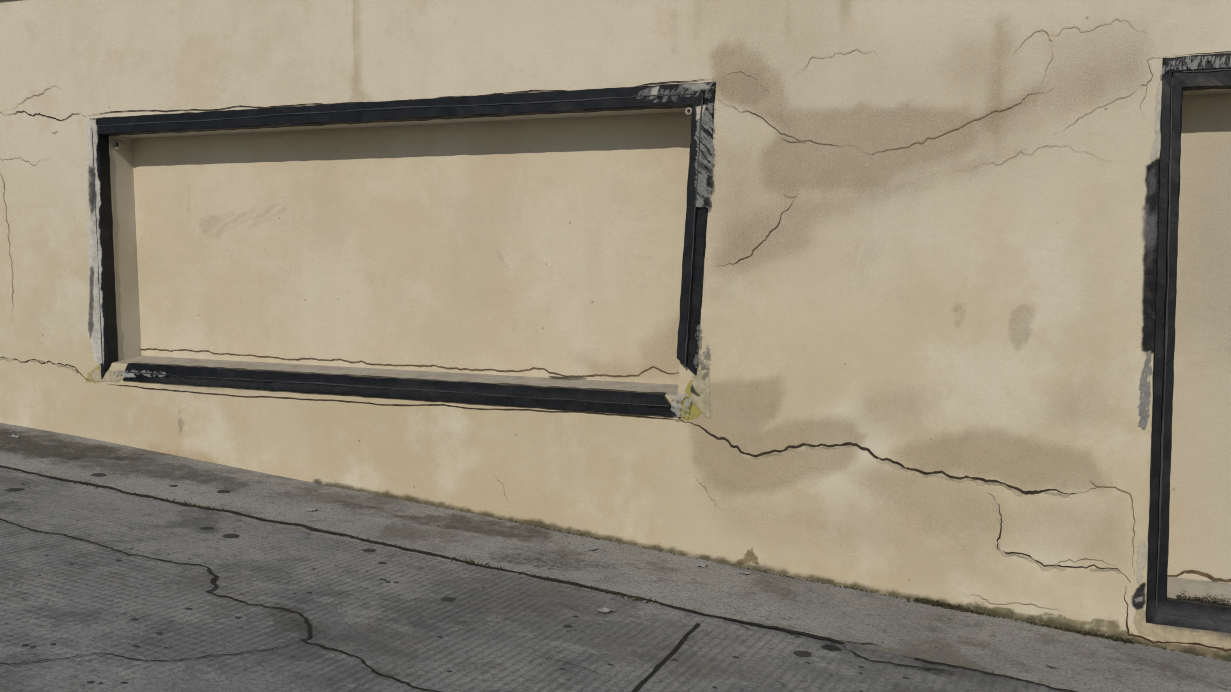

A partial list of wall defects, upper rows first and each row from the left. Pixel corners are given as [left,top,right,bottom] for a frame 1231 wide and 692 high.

crack [409,90,567,100]
crack [635,79,1054,154]
crack [959,51,1231,172]
crack [1,57,362,316]
crack [716,194,798,267]
water stain [1145,215,1156,246]
crack [140,348,679,377]
spalling [670,325,710,418]
water stain [678,380,704,420]
crack [0,357,1231,652]